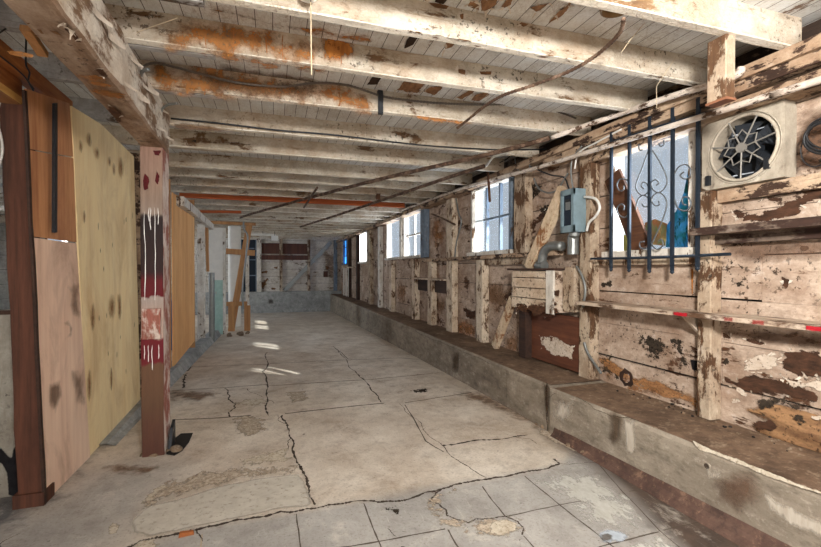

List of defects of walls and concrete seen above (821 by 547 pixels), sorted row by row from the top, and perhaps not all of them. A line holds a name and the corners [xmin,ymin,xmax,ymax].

peeling [460,0,512,19]
peeling [517,3,575,27]
peeling [394,81,442,95]
peeling [454,90,489,102]
peeling [532,205,549,233]
peeling [730,189,821,222]
peeling [539,335,575,359]
peeling [723,333,821,403]
leakage [51,385,59,405]
crack [127,347,595,547]
spalling [142,465,302,507]
spalling [428,492,526,536]